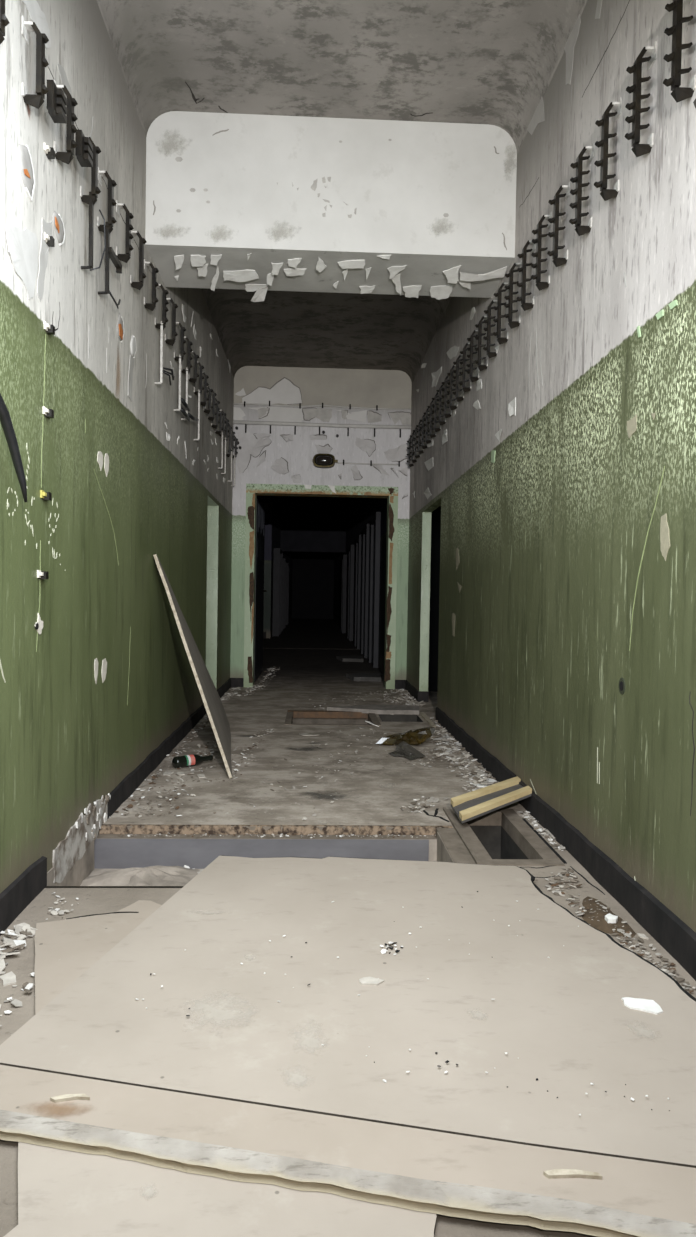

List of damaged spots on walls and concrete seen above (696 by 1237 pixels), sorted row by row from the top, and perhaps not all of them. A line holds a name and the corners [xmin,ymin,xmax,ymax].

peeling [174,254,507,302]
peeling [182,304,231,372]
peeling [165,377,333,483]
peeling [338,429,448,480]
peeling [416,346,459,392]
peeling [453,359,484,416]
peeling [508,397,516,416]
crack [530,866,605,895]
spalling [517,866,696,1002]
flaking render [622,997,663,1015]